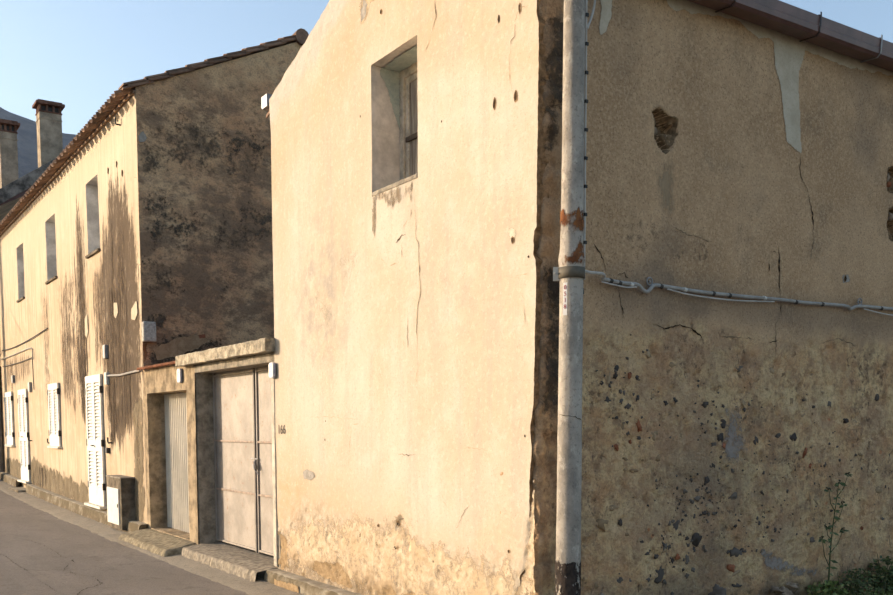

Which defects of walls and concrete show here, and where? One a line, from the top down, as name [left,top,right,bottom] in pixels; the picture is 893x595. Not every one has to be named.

peeling [599,0,612,35]
water stain [543,18,563,151]
peeling [667,0,893,153]
water stain [141,111,264,175]
spalling [652,107,678,154]
water stain [144,194,272,248]
corrosion [560,207,584,232]
corrosion [565,242,584,264]
crack [384,199,421,386]
water stain [62,219,145,522]
spalling [274,480,535,595]